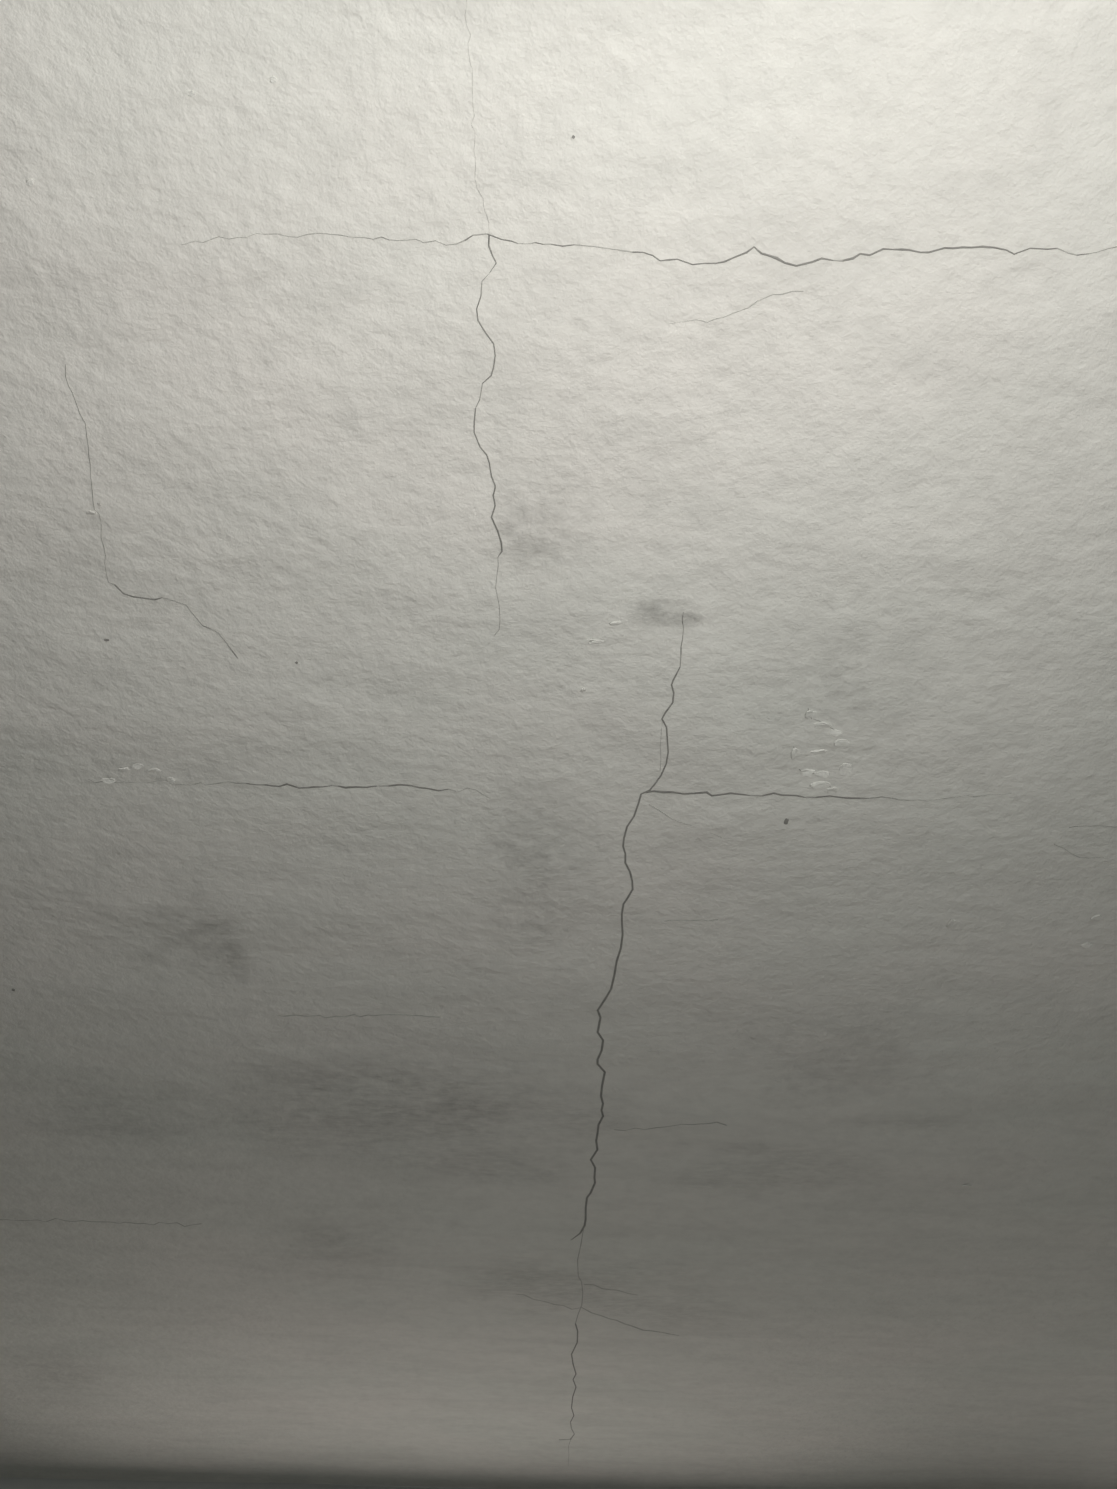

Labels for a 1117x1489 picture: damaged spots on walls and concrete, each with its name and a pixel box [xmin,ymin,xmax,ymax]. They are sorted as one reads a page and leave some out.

crack [65,364,238,658]
crack [88,779,489,798]
crack [182,0,1117,636]
crack [559,612,1011,1463]